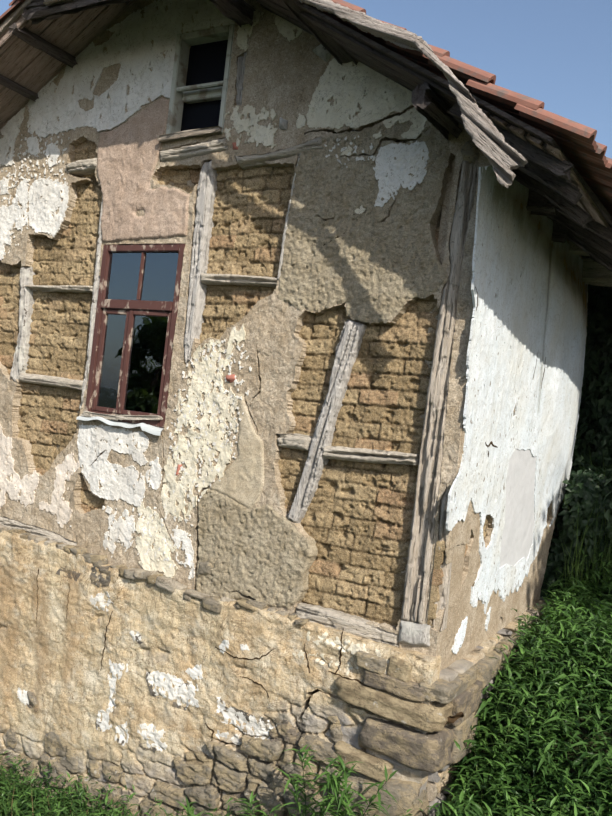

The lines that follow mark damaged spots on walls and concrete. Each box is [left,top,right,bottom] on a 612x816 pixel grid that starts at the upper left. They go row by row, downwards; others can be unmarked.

spalling [0,260,22,375]
spalling [17,172,102,475]
spalling [169,165,295,453]
spalling [291,298,440,455]
spalling [80,480,117,514]
spalling [278,447,309,513]
spalling [301,459,418,627]
crack [33,569,41,626]
crack [100,611,113,671]
crack [215,647,274,698]
crack [304,627,369,707]
crack [445,712,464,725]